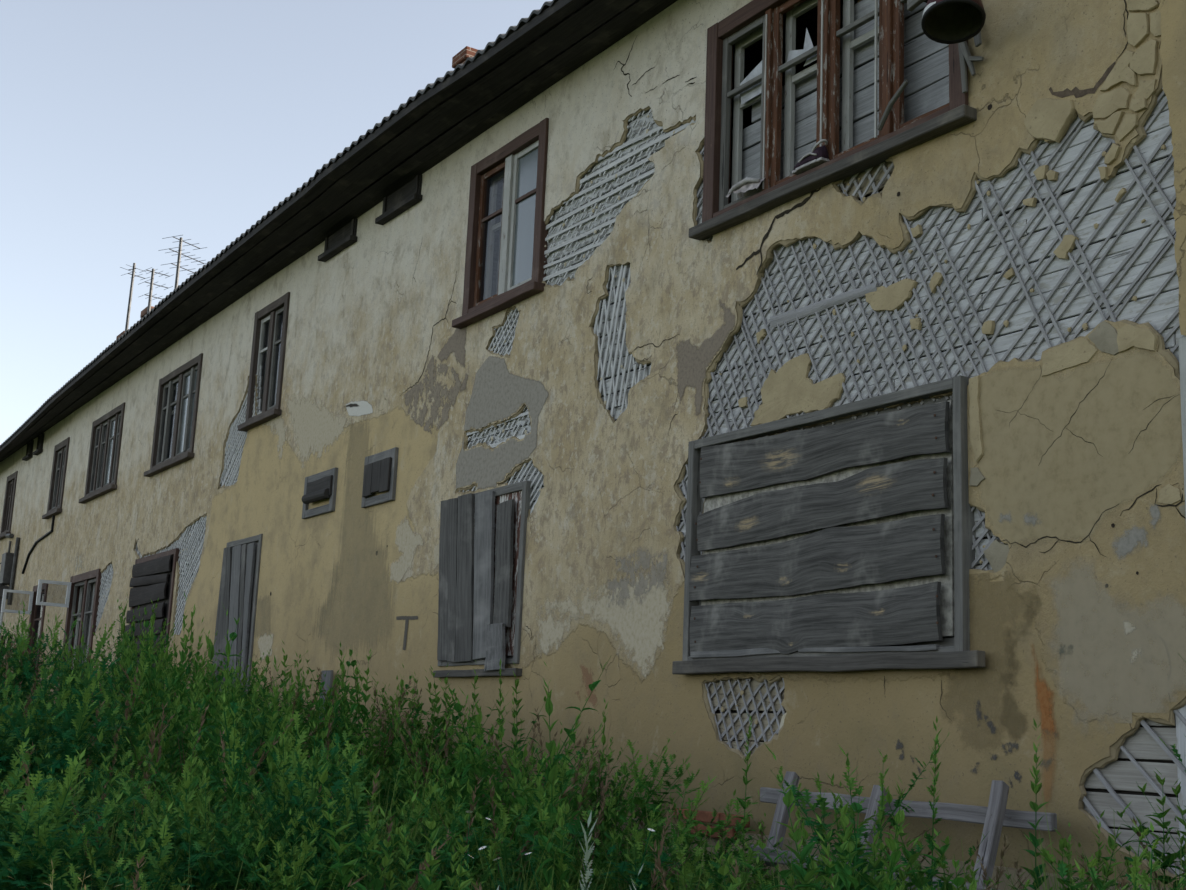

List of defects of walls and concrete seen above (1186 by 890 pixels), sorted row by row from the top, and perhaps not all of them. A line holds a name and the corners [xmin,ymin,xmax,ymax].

crack [1049,0,1128,98]
flaking render [543,109,696,286]
crack [736,188,821,273]
flaking render [676,87,1185,440]
peeling [404,308,548,514]
flaking render [593,264,651,420]
crack [997,357,1180,466]
crack [997,483,1186,557]
flaking render [705,678,787,756]
leakage [944,571,1032,747]
rust [1035,665,1055,799]
flaking render [1082,705,1186,878]